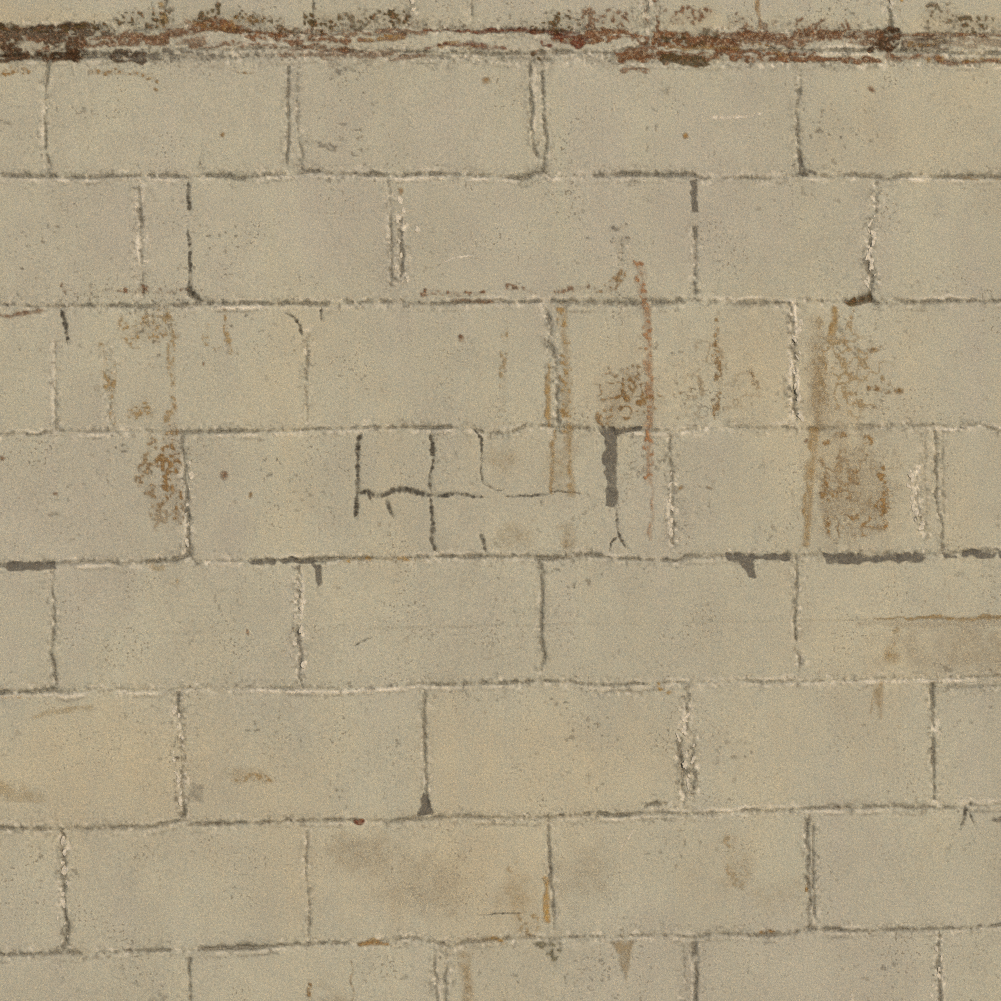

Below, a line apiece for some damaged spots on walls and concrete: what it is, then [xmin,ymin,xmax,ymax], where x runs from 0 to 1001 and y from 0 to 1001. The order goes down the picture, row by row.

corrosion [0,22,115,76]
corrosion [97,49,158,90]
corrosion [159,3,433,51]
corrosion [428,20,682,73]
corrosion [694,30,999,65]
corrosion [545,340,571,446]
corrosion [596,261,653,479]
corrosion [814,307,846,400]
corrosion [136,432,183,524]
crack [354,435,483,550]
corrosion [803,457,890,538]